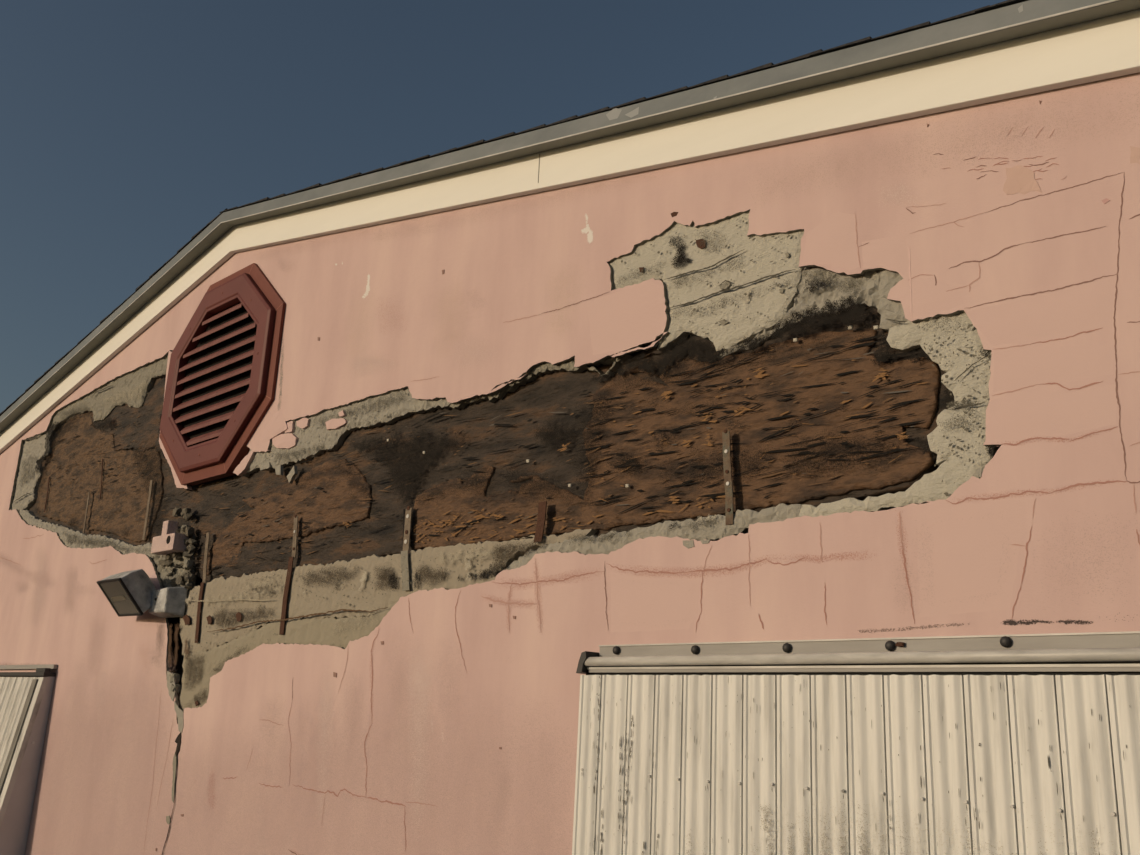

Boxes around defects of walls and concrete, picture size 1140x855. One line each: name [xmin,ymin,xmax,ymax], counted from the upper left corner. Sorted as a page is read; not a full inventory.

spalling [11,212,998,711]
crack [906,153,1140,617]
water stain [299,539,546,593]
crack [455,525,827,669]
crack [899,512,915,624]
crack [144,696,184,854]
crack [224,630,438,851]